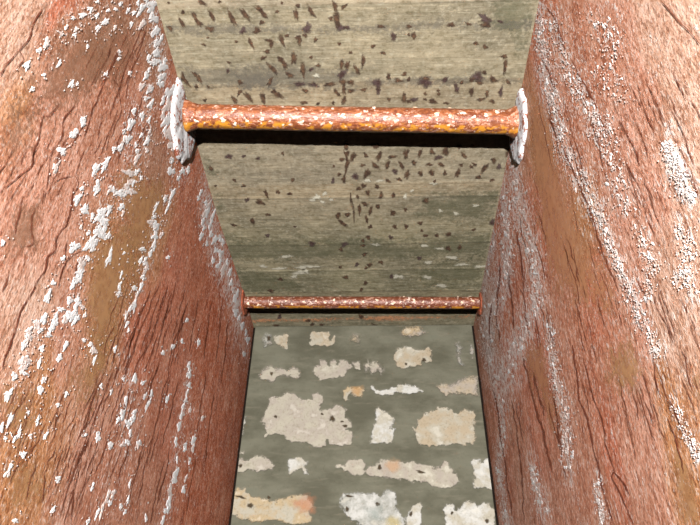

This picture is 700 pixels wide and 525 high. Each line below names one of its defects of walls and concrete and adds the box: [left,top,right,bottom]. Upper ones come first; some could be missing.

corrosion [179,0,215,46]
corrosion [0,107,83,252]
corrosion [19,8,147,161]
corrosion [558,130,644,332]
corrosion [628,78,699,196]
corrosion [3,166,212,524]
peeling [437,163,579,525]
spalling [232,487,313,525]
spalling [262,384,424,448]
spalling [339,490,423,525]
spalling [336,459,459,488]
spalling [413,406,476,447]